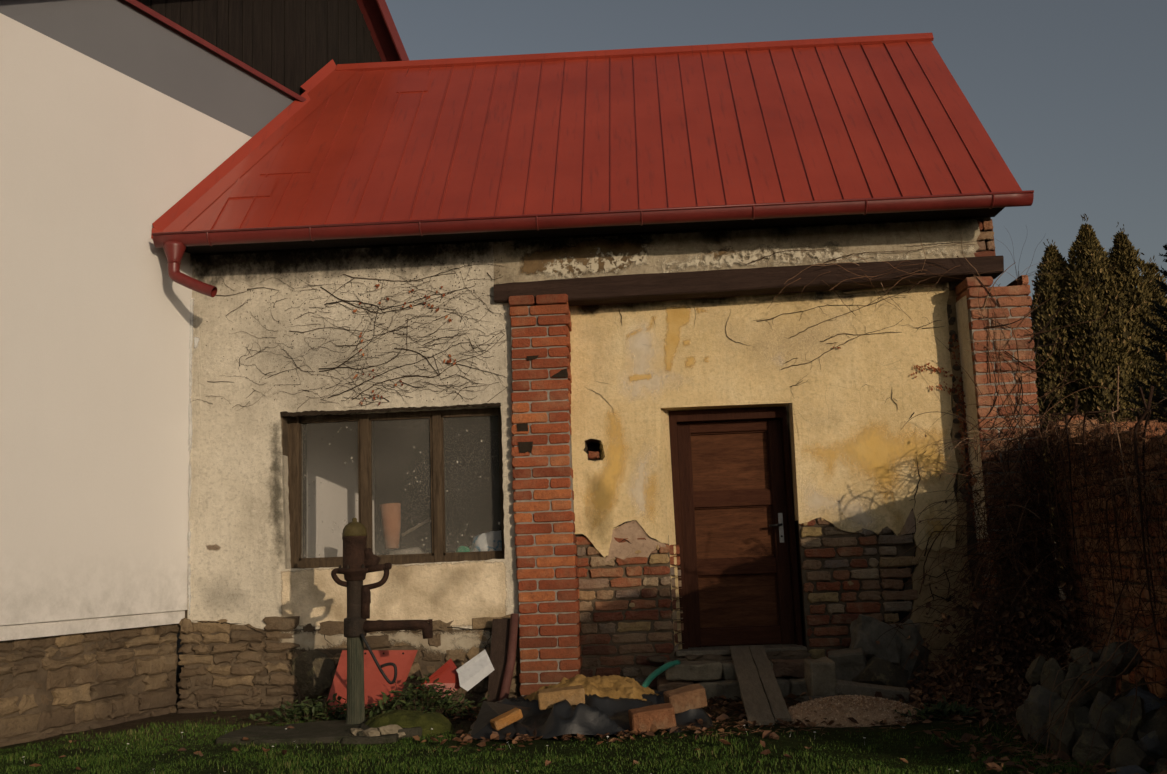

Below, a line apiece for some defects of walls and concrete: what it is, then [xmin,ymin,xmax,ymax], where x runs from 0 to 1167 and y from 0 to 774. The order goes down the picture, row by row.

peeling [520,237,649,279]
peeling [662,245,974,273]
water stain [272,437,282,542]
spalling [947,290,972,553]
spalling [575,520,684,691]
spalling [799,508,921,659]